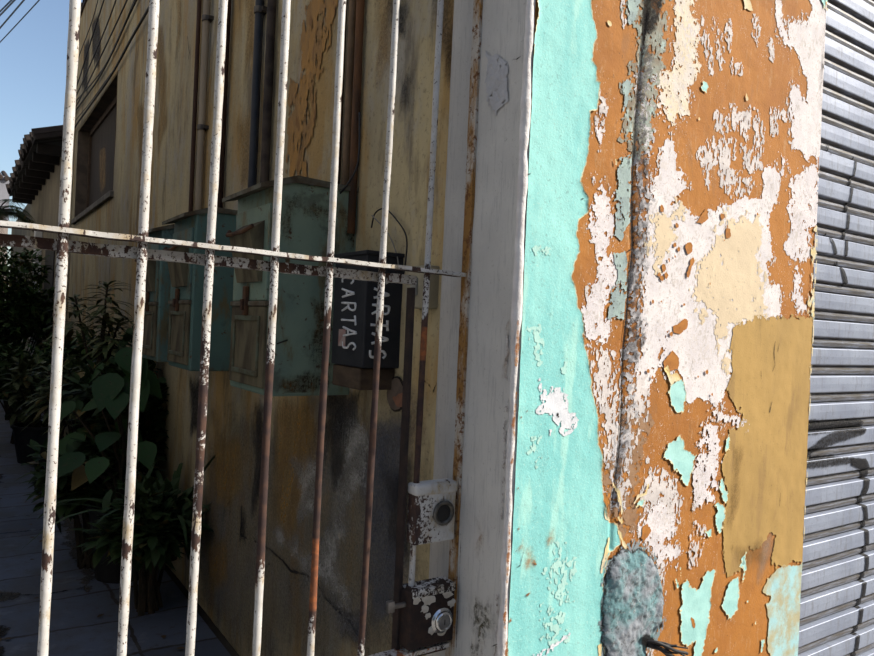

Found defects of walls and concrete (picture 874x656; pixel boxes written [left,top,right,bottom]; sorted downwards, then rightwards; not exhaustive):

damp [642,0,663,33]
damp [189,378,199,434]
damp [202,392,416,656]
damp [627,113,649,372]
peeling [494,0,828,656]